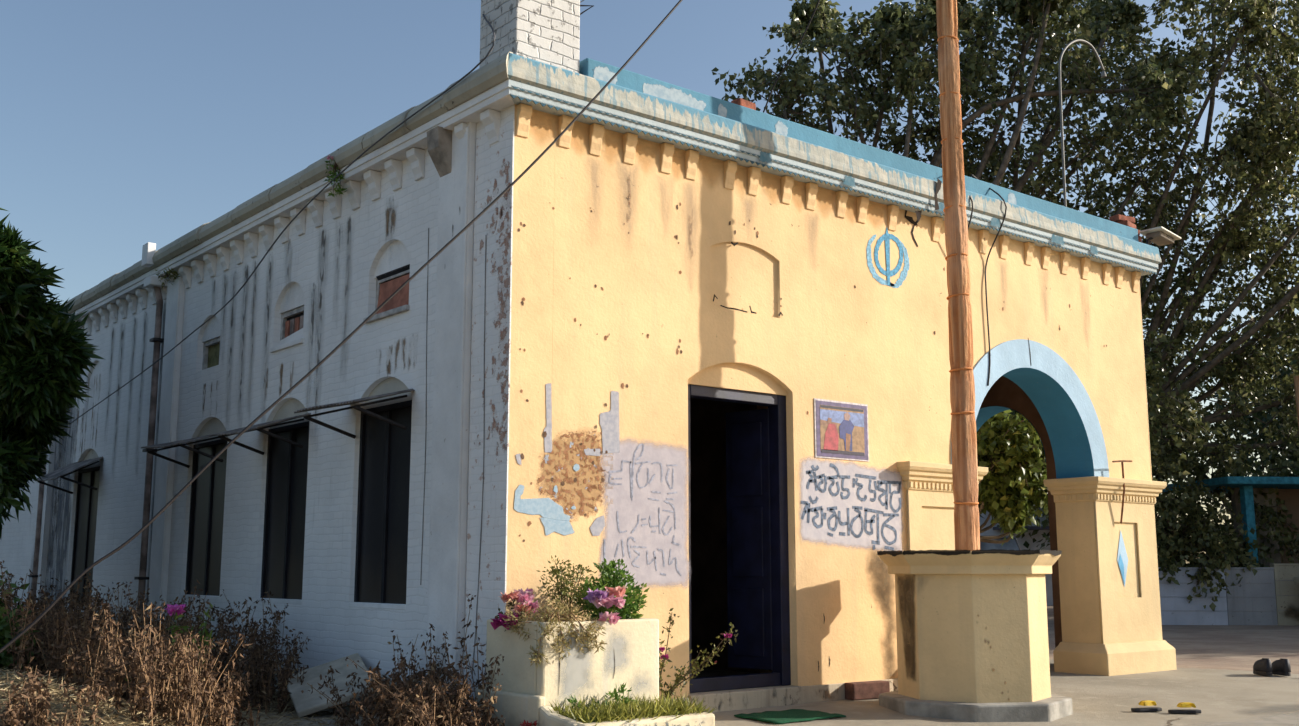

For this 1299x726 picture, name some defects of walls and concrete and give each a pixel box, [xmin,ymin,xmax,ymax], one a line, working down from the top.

peeling [594,66,617,84]
peeling [643,83,727,118]
peeling [775,121,788,136]
peeling [474,159,529,465]
peeling [514,383,628,542]